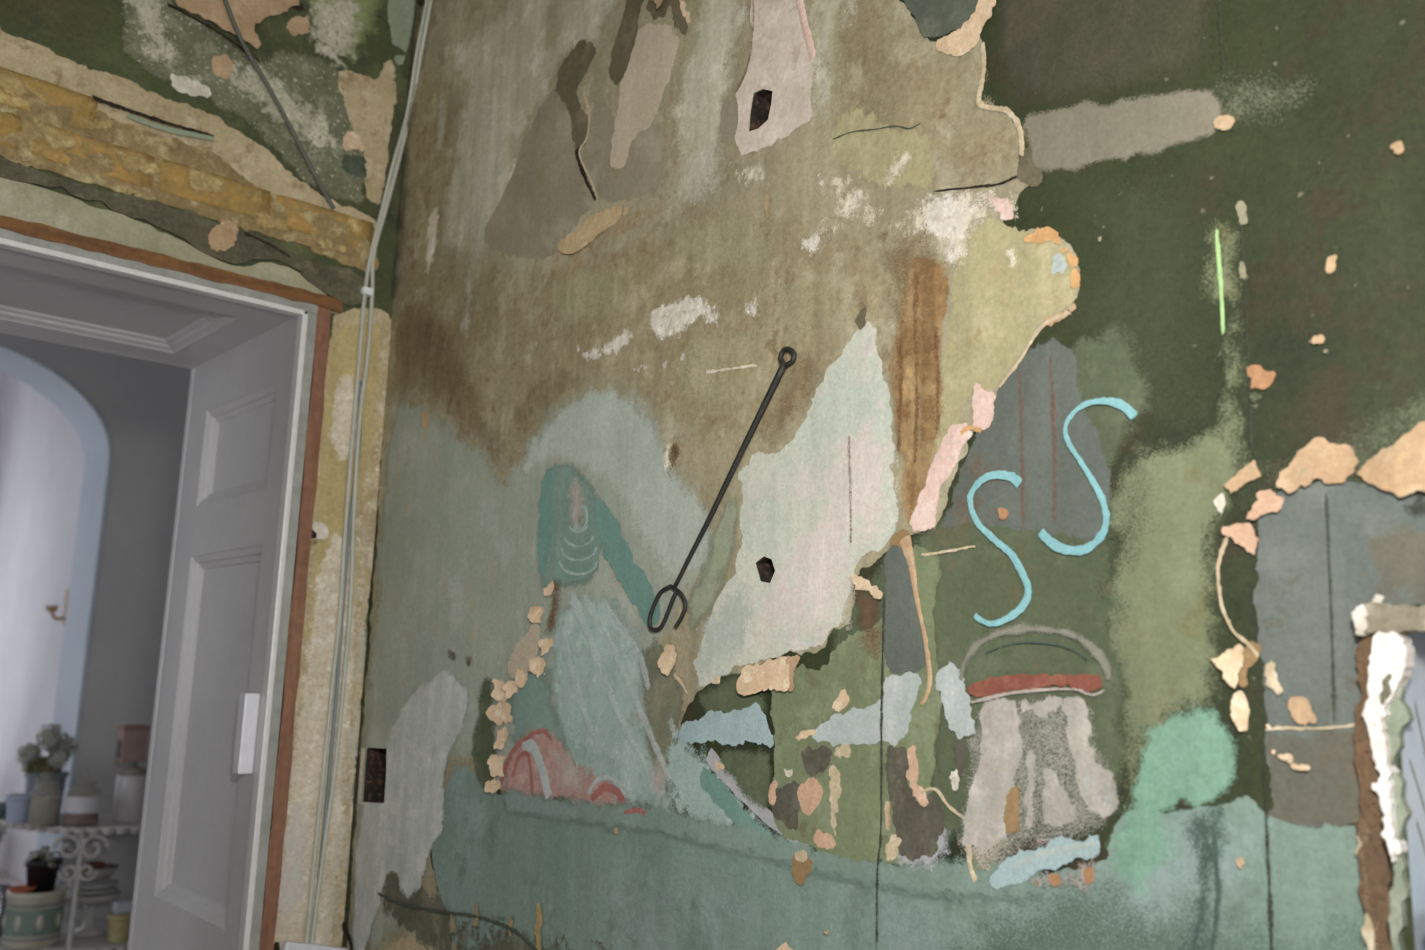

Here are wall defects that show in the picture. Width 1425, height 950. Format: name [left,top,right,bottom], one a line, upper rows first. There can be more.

crack [92,94,215,141]
leakage [121,0,367,206]
crack [575,146,596,201]
peeling [0,0,1080,950]
flaking render [1352,594,1415,862]